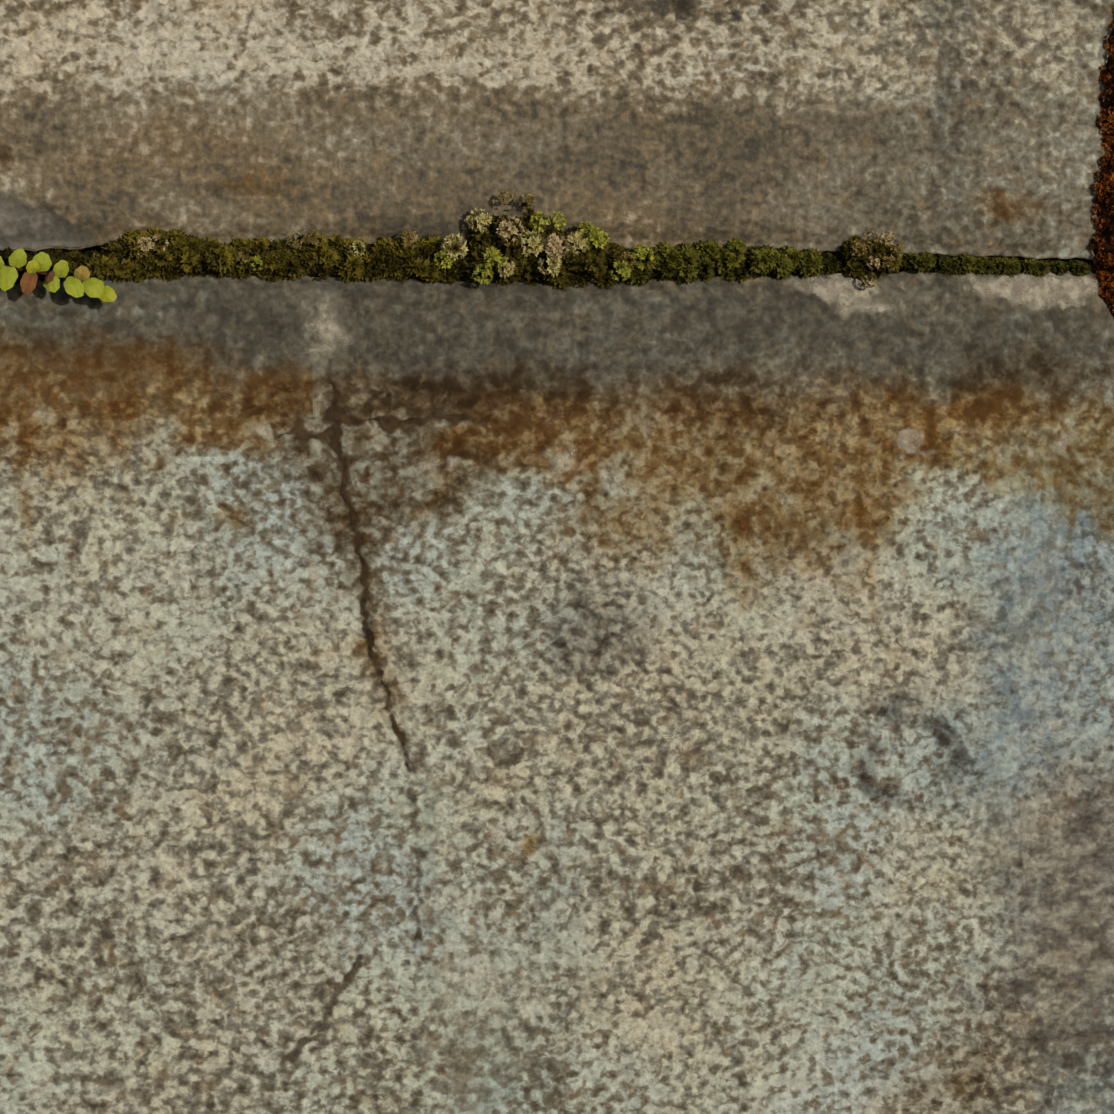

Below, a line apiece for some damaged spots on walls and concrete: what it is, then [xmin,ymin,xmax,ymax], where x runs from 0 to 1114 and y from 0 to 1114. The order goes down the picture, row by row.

crack [278,379,486,943]
crack [280,954,364,1066]